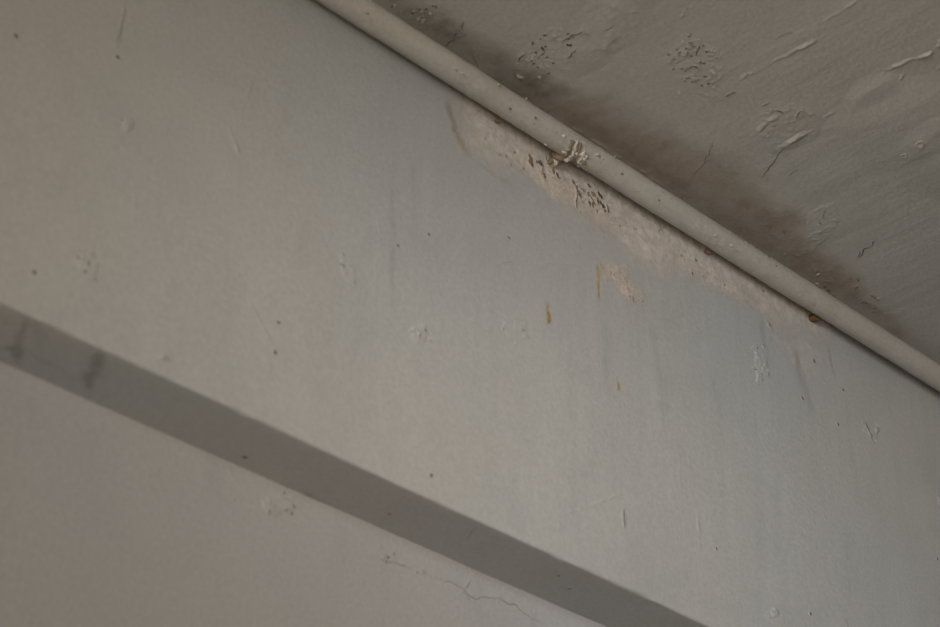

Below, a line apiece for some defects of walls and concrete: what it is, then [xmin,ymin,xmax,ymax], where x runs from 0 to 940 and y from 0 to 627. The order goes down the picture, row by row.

spalling [498,151,621,227]
leakage [450,95,830,333]
crack [375,555,545,626]